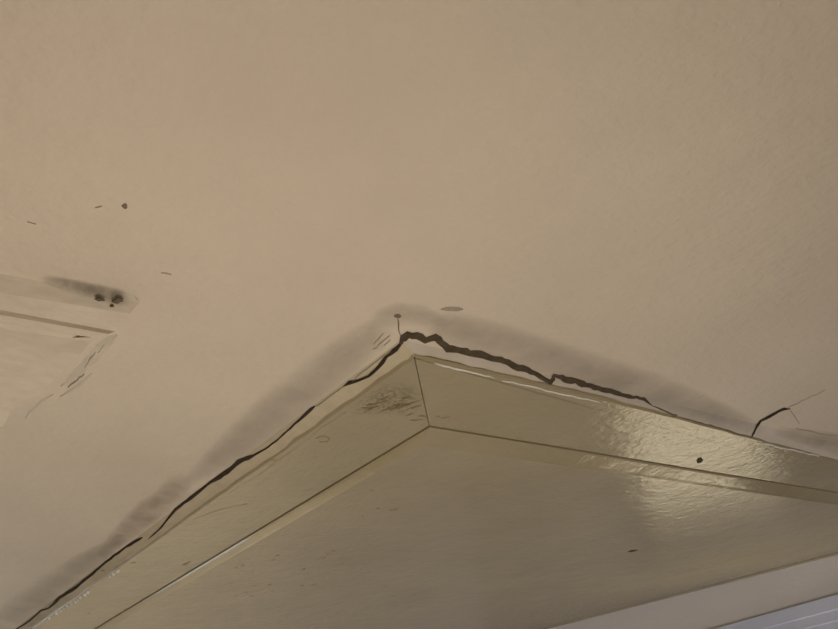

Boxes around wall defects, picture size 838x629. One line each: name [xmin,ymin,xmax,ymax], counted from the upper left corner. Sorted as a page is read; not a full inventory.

crack [16,314,838,629]